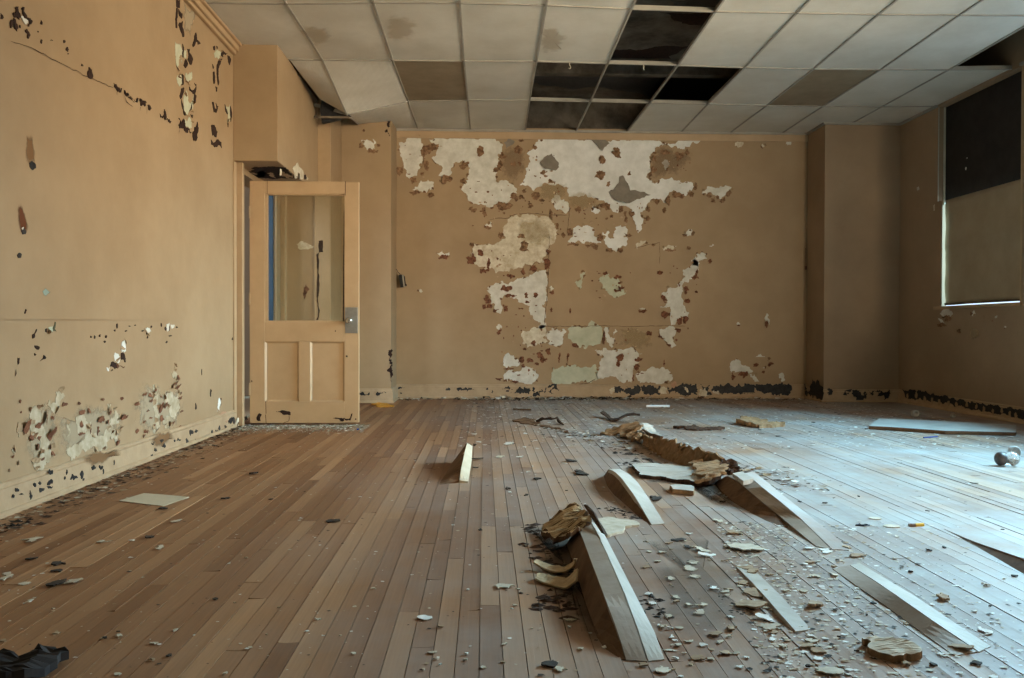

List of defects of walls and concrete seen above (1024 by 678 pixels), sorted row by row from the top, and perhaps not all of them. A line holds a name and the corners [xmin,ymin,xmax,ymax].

crack [11,41,113,88]
peeling [114,0,232,148]
peeling [359,121,1024,420]
peeling [9,363,198,500]